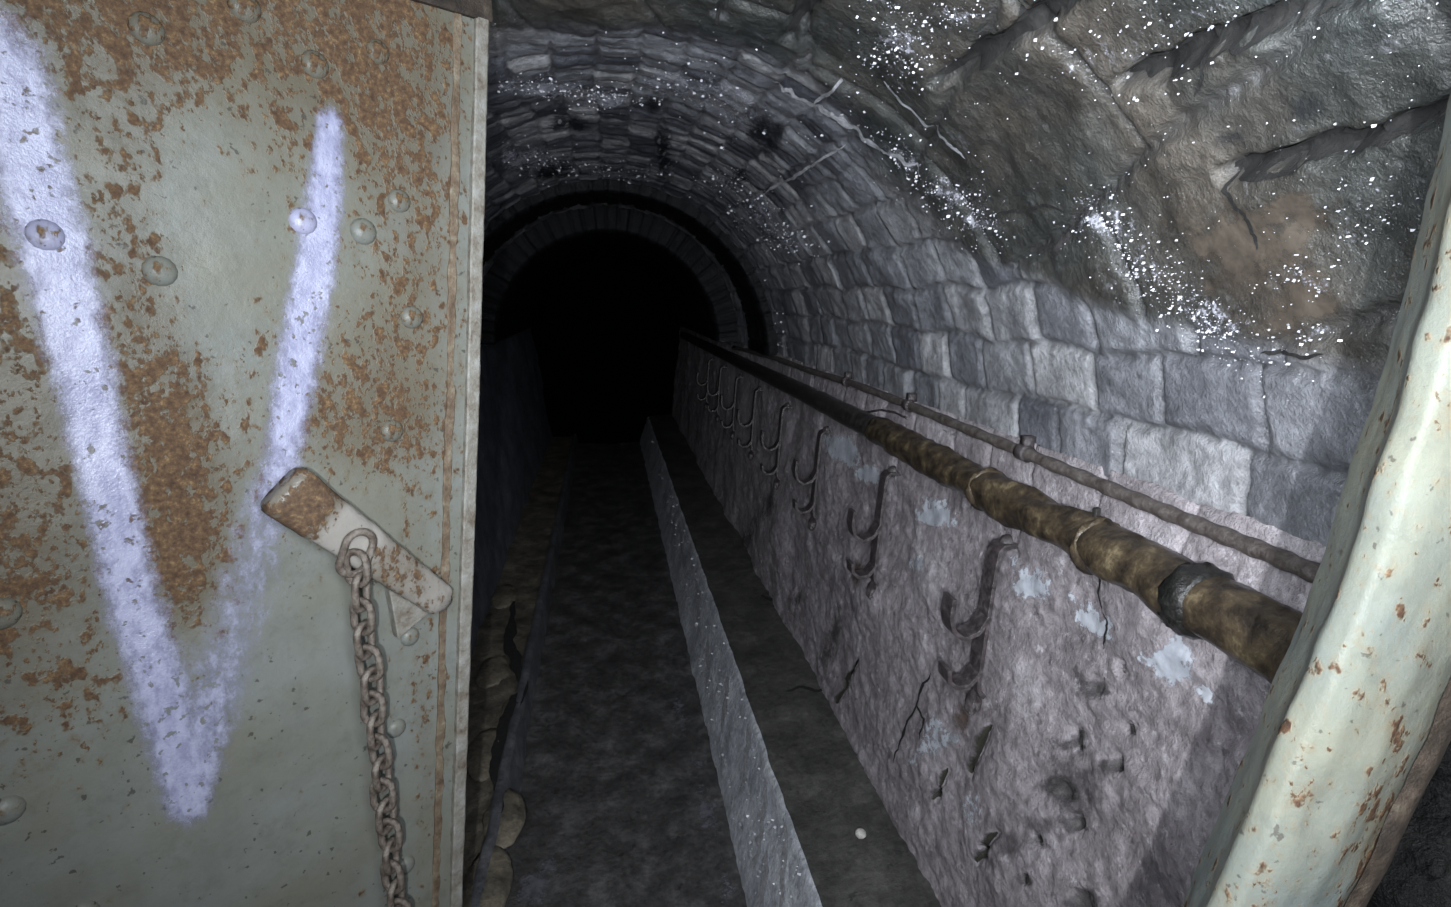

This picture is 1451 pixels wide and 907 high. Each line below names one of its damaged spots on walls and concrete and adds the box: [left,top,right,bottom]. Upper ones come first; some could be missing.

water stain [840,0,985,95]
water stain [1119,0,1239,82]
water stain [860,111,1015,252]
water stain [1059,184,1343,398]
water stain [1265,206,1368,305]
crack [893,671,931,763]